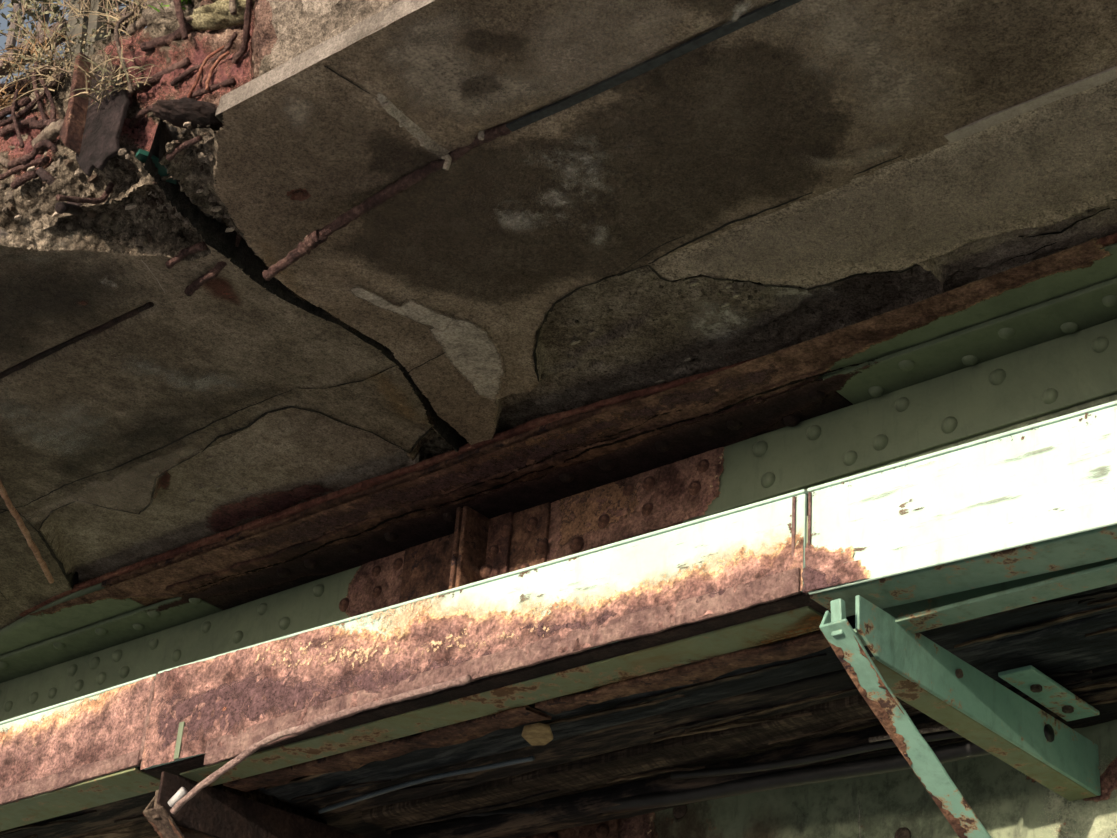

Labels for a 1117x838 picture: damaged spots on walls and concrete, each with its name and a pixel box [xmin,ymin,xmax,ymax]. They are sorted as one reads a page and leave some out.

spalling [0,0,278,296]
leakage [389,20,536,114]
leakage [346,40,846,303]
crack [0,120,468,589]
corrosion [29,238,1113,627]
spalling [491,200,1117,438]
corrosion [223,614,830,792]
corrosion [1083,756,1117,802]